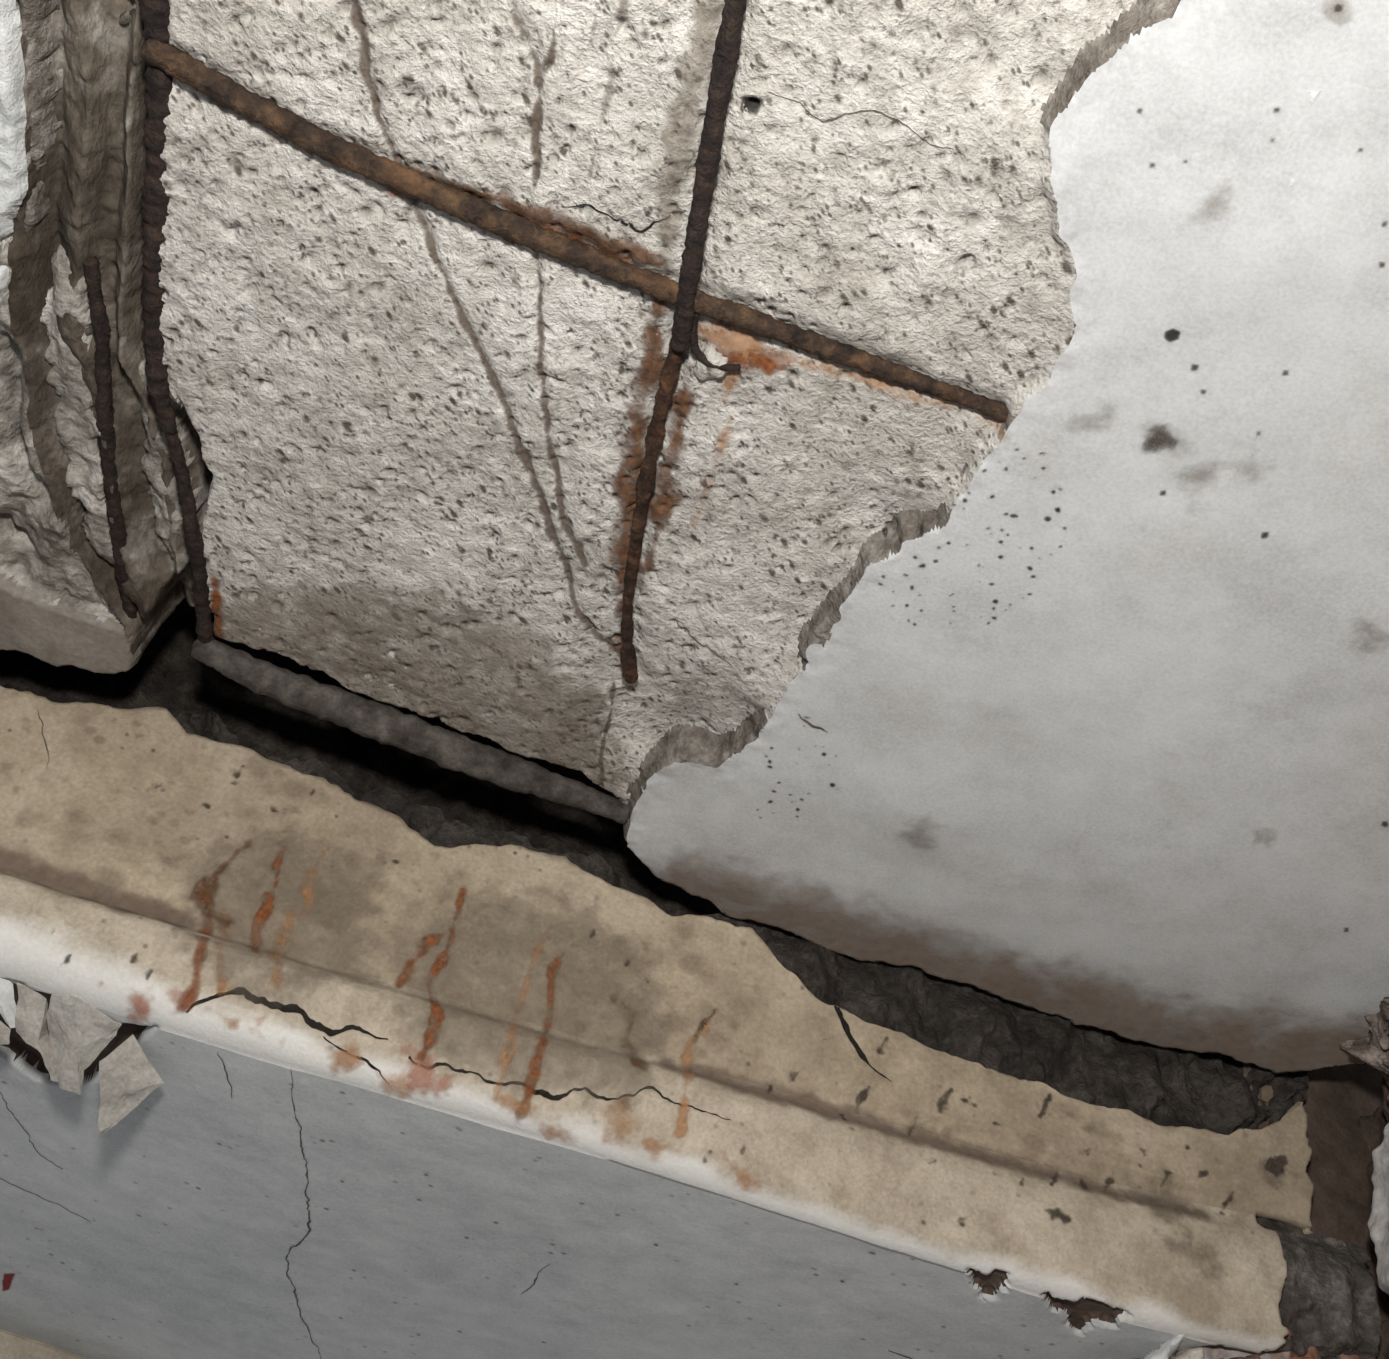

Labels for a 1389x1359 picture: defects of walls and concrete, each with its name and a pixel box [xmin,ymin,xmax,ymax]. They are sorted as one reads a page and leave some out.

rust [403,167,668,279]
crack [562,204,686,233]
rust [697,325,803,388]
spalling [0,0,1181,915]
rust [611,297,693,651]
rust [178,842,251,1011]
peeling [0,978,164,1136]
crack [186,987,731,1120]
crack [829,992,892,1082]
crack [286,1072,321,1357]
spalling [1044,1292,1124,1330]
spalling [1220,1217,1382,1359]